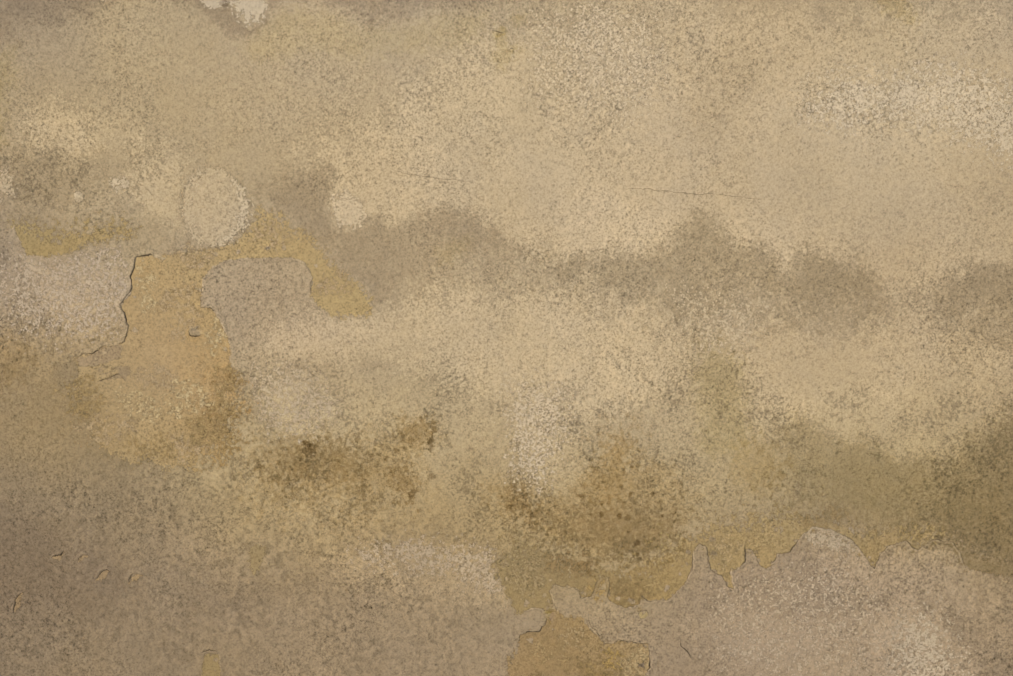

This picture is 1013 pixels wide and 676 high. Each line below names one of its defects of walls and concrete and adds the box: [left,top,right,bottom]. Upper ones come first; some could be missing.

leakage [502,0,682,155]
efflorescence [330,185,368,233]
peeling [1,203,374,477]
leakage [240,346,354,455]
efflorescence [492,366,584,499]
leakage [653,271,788,375]
efflorescence [345,526,505,606]
peeling [485,499,1013,676]